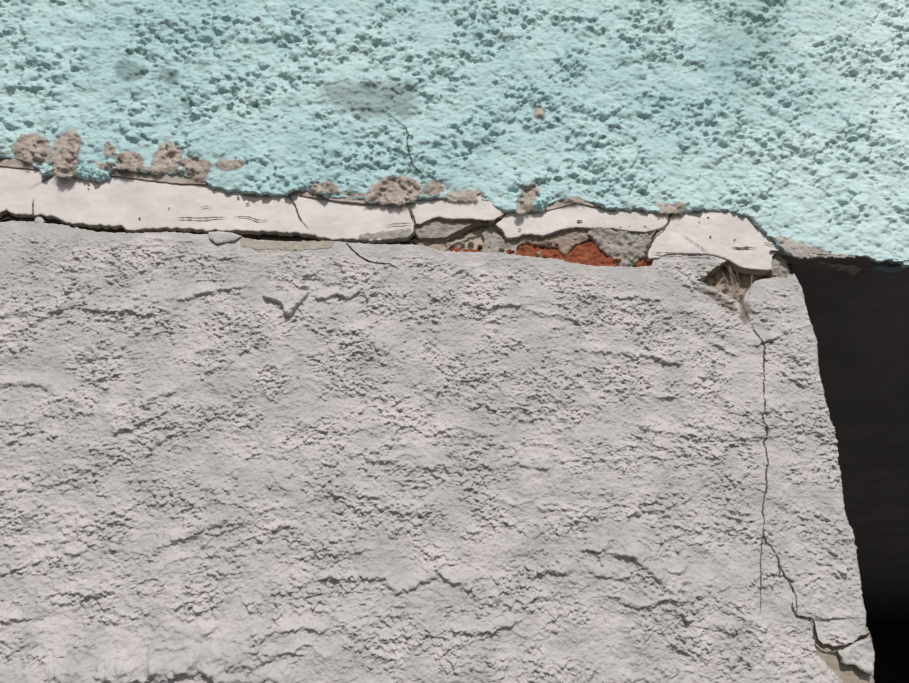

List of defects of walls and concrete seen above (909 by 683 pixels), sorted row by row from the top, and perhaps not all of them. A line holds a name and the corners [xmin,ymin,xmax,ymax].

peeling [0,130,244,180]
crack [0,174,128,233]
crack [154,195,422,268]
spalling [311,174,686,267]
crack [743,305,801,618]
peeling [798,615,875,683]